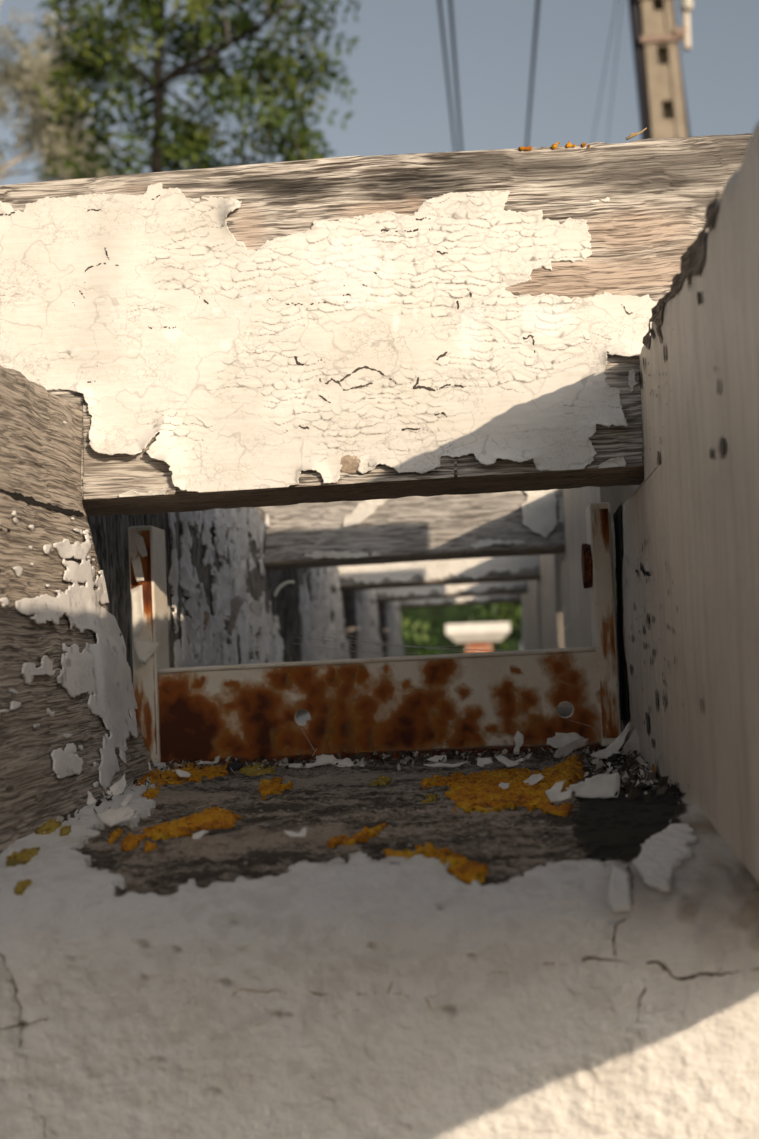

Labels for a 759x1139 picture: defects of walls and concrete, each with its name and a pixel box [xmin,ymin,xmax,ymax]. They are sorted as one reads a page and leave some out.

peeling [0,136,753,469]
peeling [83,394,175,500]
peeling [293,454,551,487]
corrosion [130,530,153,633]
peeling [131,533,159,665]
peeling [203,588,245,640]
corrosion [592,508,610,549]
corrosion [134,651,619,760]
spalling [76,605,689,897]
crack [0,954,59,1047]
crack [582,865,759,1039]